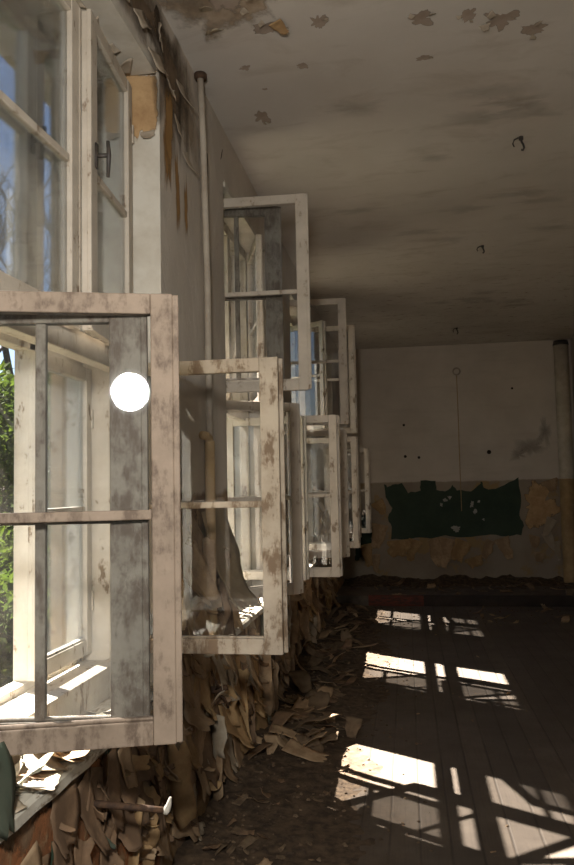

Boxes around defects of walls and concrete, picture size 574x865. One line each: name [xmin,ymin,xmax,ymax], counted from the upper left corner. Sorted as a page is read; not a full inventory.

flaking render [109,0,196,138]
leakage [125,0,266,230]
peeling [310,15,330,28]
peeling [408,10,436,26]
peeling [456,8,547,40]
peeling [349,478,524,573]
peeling [0,496,379,865]